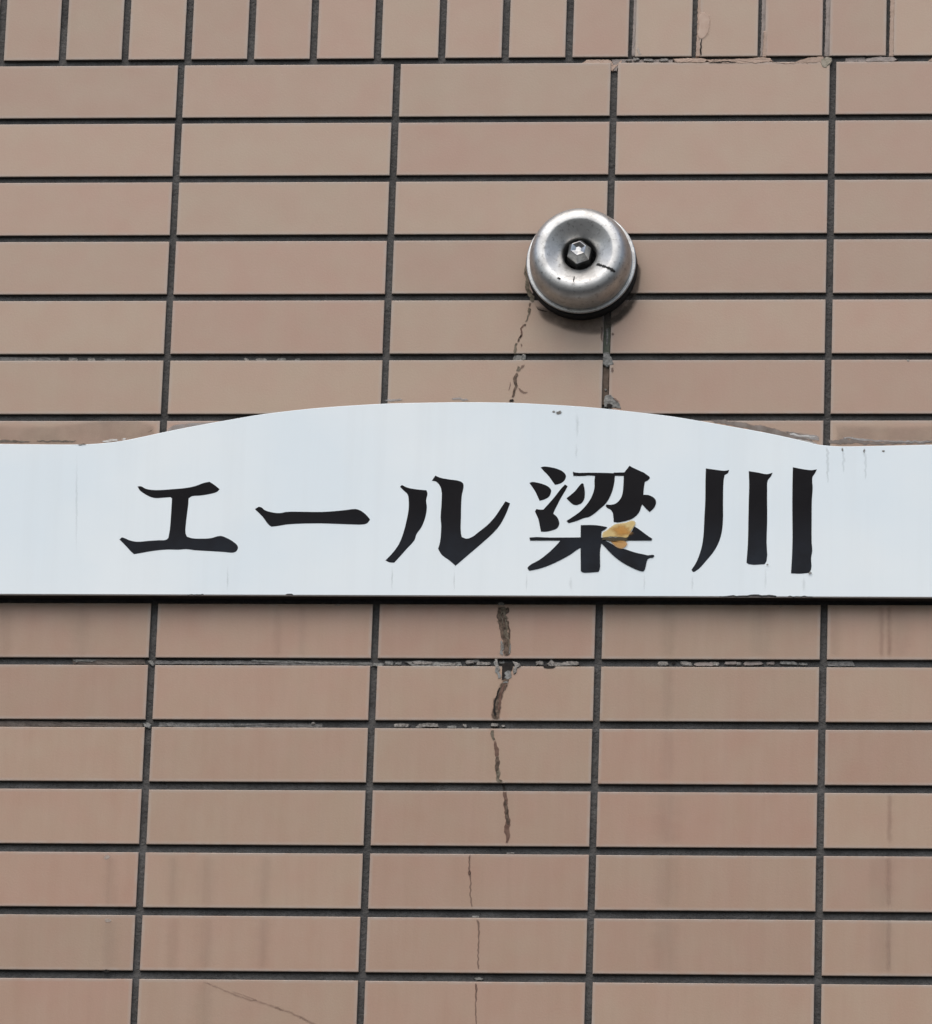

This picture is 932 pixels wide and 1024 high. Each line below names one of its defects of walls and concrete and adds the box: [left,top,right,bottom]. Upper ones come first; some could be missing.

crack [509,303,531,402]
rust [602,521,635,548]
spalling [251,659,505,667]
crack [490,602,521,843]